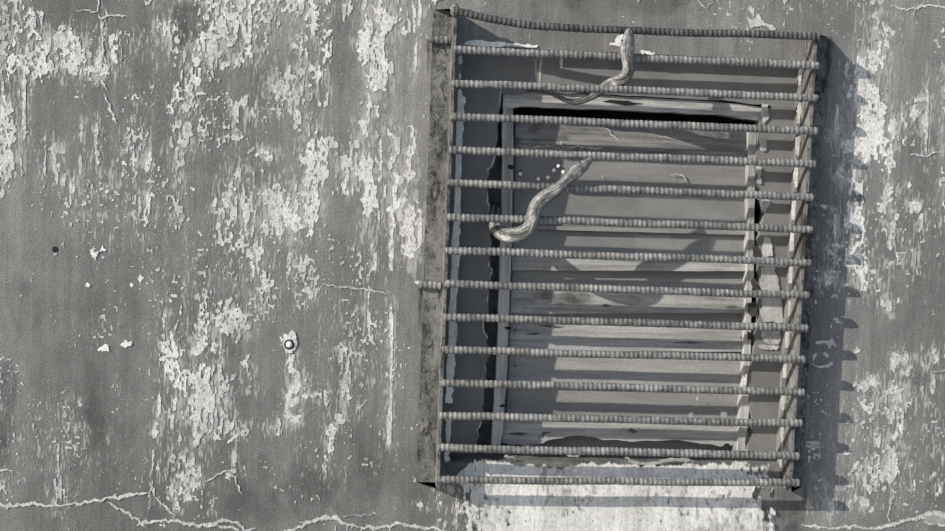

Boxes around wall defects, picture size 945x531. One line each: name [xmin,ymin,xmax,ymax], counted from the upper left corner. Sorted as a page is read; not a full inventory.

spalling [706,0,794,51]
crack [889,4,945,15]
peeling [810,0,945,312]
spalling [445,35,538,403]
spalling [758,102,801,468]
spalling [811,316,863,370]
peeling [0,346,105,519]
peeling [805,343,945,529]
crack [0,482,255,531]
crack [204,470,243,494]
crack [284,513,445,531]
crack [801,490,945,531]